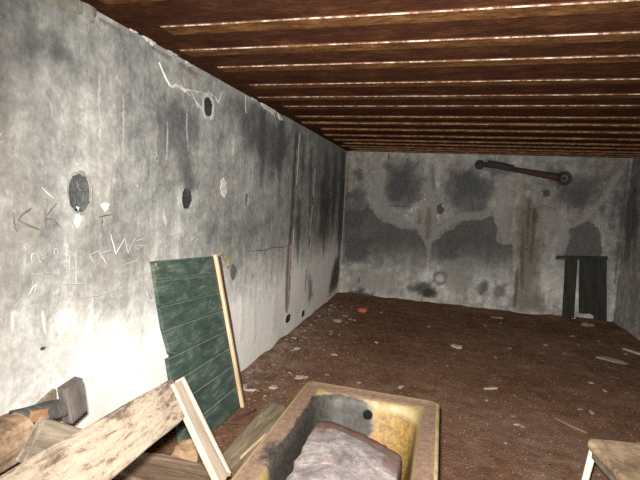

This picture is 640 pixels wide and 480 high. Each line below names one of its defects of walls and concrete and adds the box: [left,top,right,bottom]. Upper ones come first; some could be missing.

crack [158,62,226,112]
spalling [67,170,93,228]
leakage [330,260,339,292]